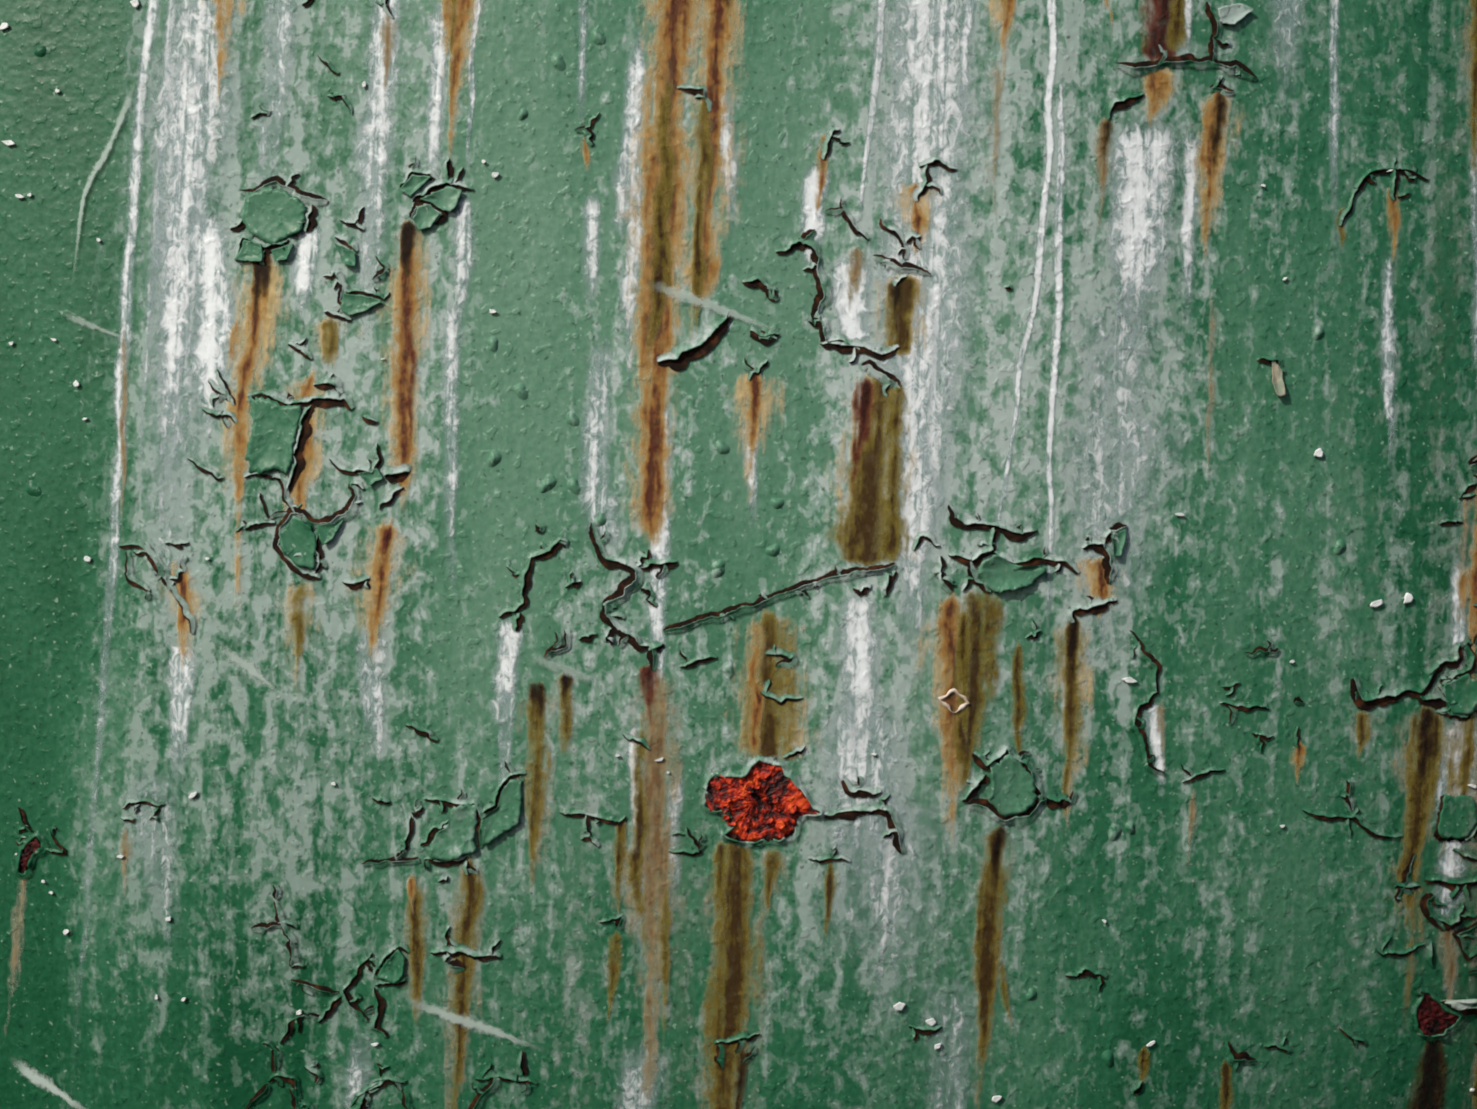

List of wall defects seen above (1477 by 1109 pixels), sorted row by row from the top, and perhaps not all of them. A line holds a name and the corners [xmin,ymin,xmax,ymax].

damp [109,0,234,585]
peeling [228,170,328,265]
peeling [235,389,411,580]
corrosion [389,221,428,493]
corrosion [633,0,739,537]
corrosion [836,377,904,566]
damp [832,0,973,628]
damp [996,0,1065,601]
peeling [947,504,1128,594]
damp [1074,125,1199,595]
peeling [417,759,526,875]
corrosion [920,592,1026,817]